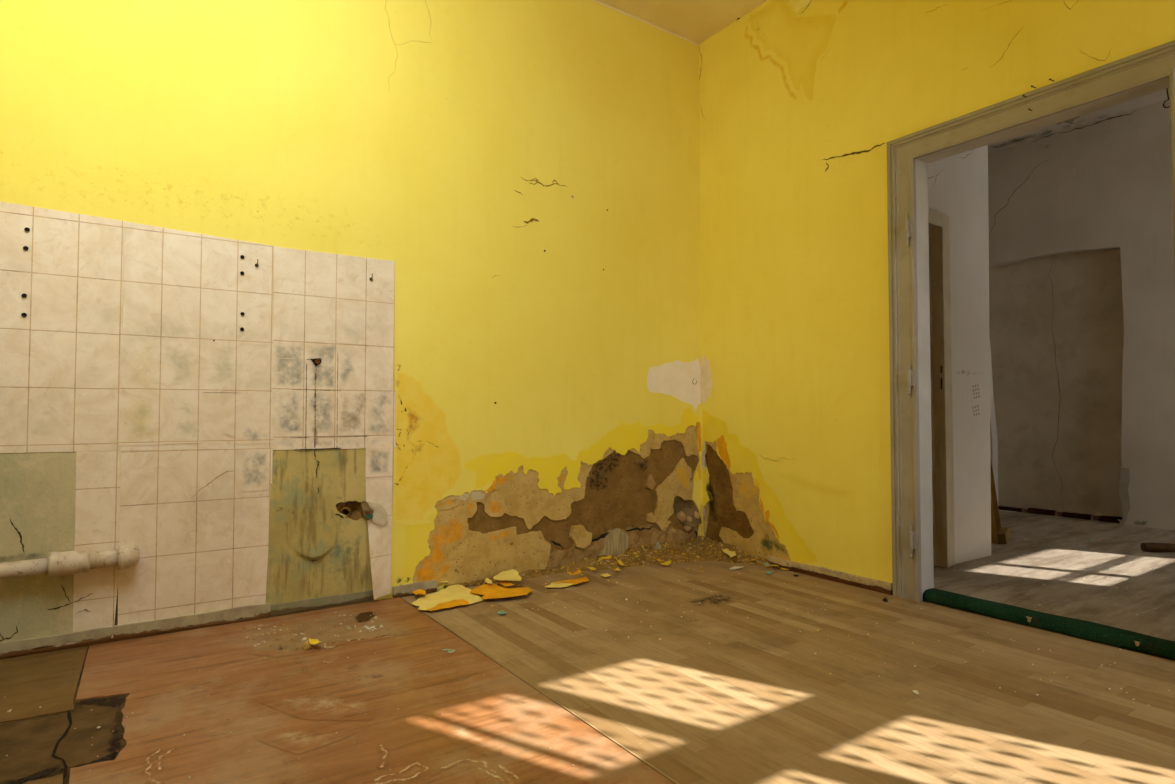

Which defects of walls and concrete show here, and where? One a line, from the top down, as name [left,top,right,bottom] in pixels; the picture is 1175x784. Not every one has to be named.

flaking render [413,351,791,615]